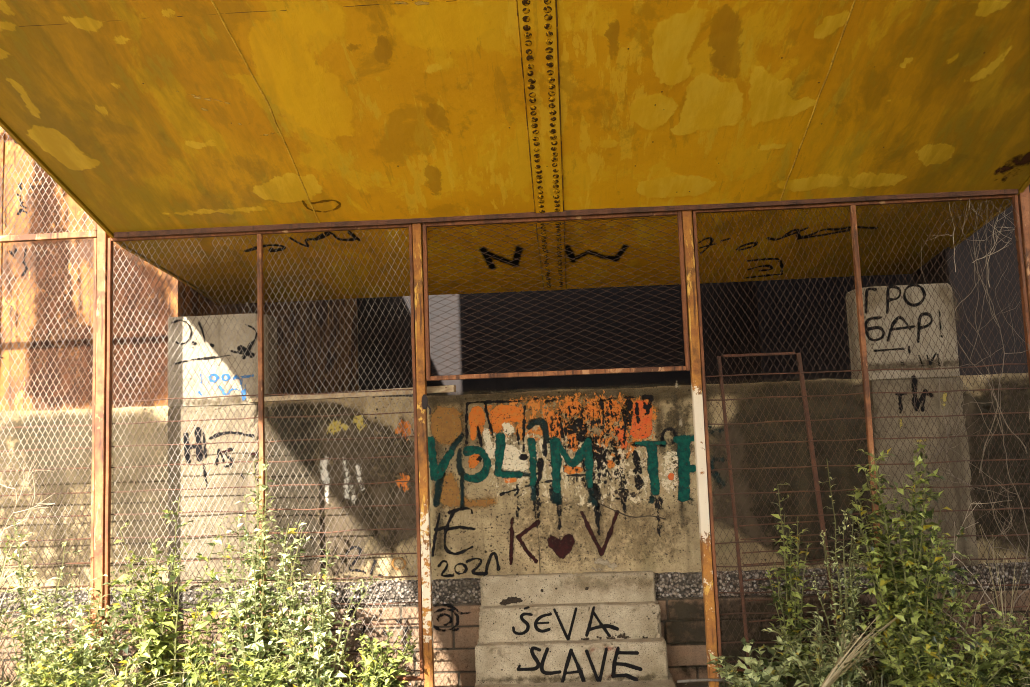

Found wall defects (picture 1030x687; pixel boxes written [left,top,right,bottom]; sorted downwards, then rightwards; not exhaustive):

corrosion [995,152,1030,181]
corrosion [8,162,93,408]
peeling [430,390,698,573]